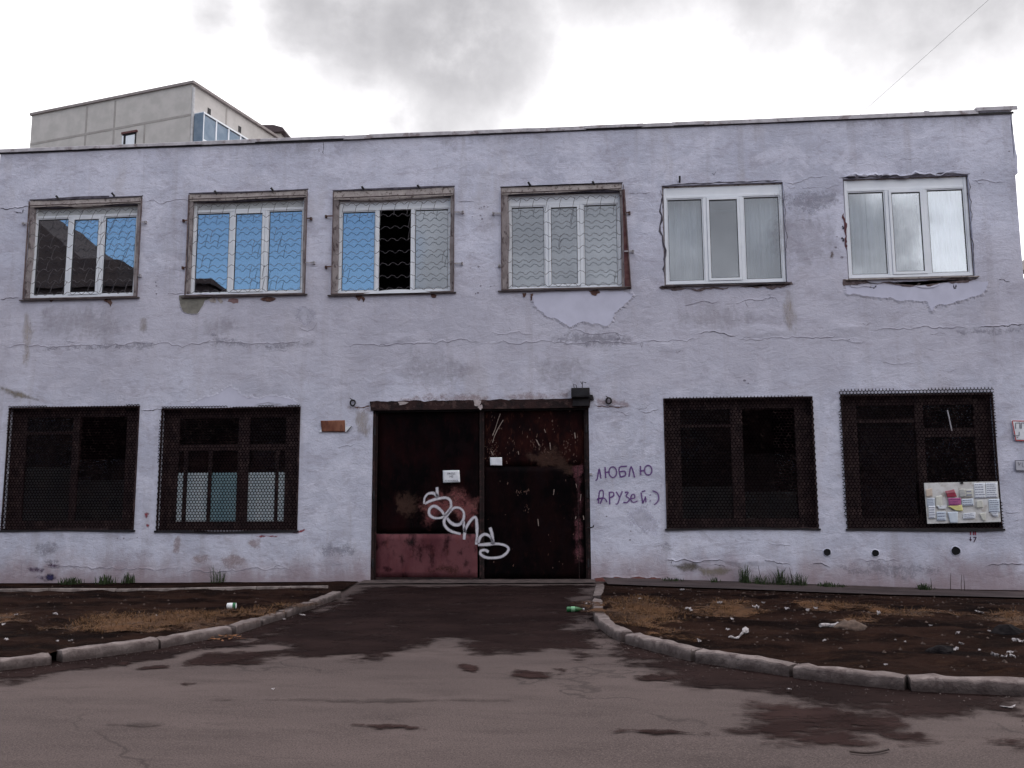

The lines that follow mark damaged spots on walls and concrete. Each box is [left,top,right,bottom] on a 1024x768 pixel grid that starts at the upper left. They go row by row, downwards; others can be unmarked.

spalling [659,190,667,275]
spalling [155,282,238,315]
peeling [530,290,635,329]
peeling [843,281,990,314]
crack [345,322,1024,352]